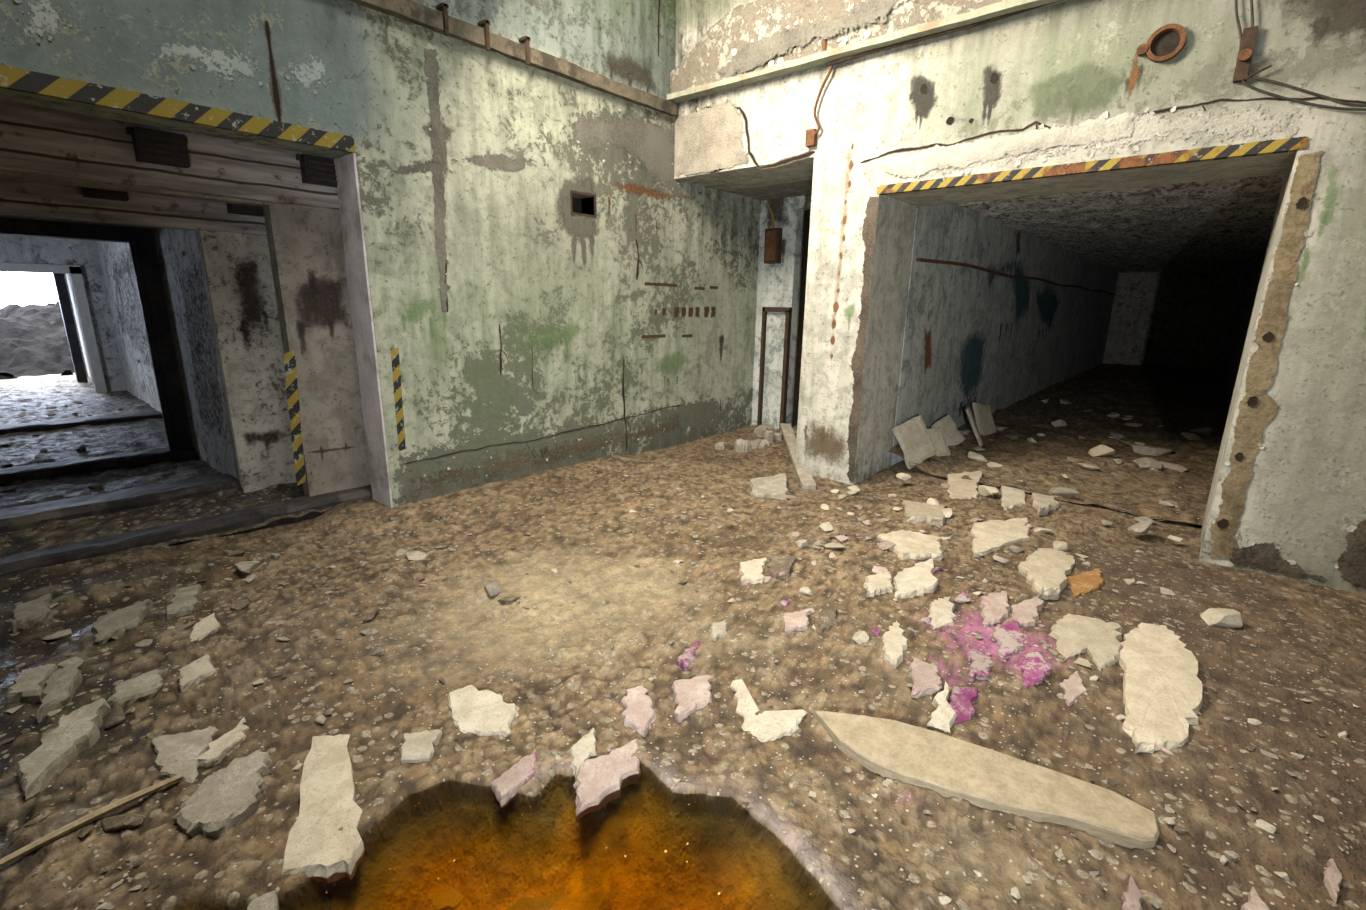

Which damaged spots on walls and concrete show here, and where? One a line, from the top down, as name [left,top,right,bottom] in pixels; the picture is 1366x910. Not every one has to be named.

peeling [14,0,72,43]
spalling [717,0,915,79]
spalling [572,97,748,207]
damp [909,76,937,125]
damp [982,67,1001,120]
peeling [916,98,1299,181]
damp [237,264,268,350]
damp [295,272,346,351]
spalling [1210,150,1366,589]